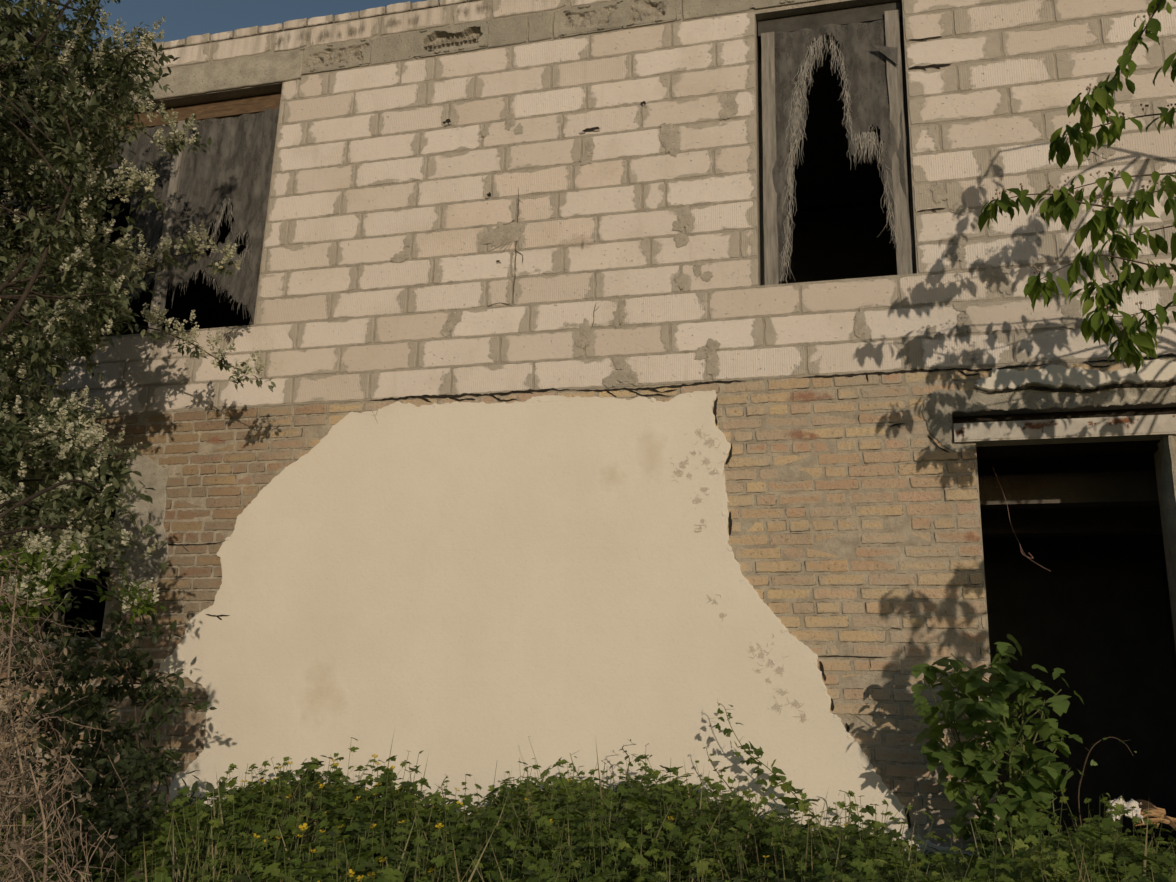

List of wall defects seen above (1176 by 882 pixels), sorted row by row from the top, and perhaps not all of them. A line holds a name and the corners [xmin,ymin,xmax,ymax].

spalling [414,21,489,56]